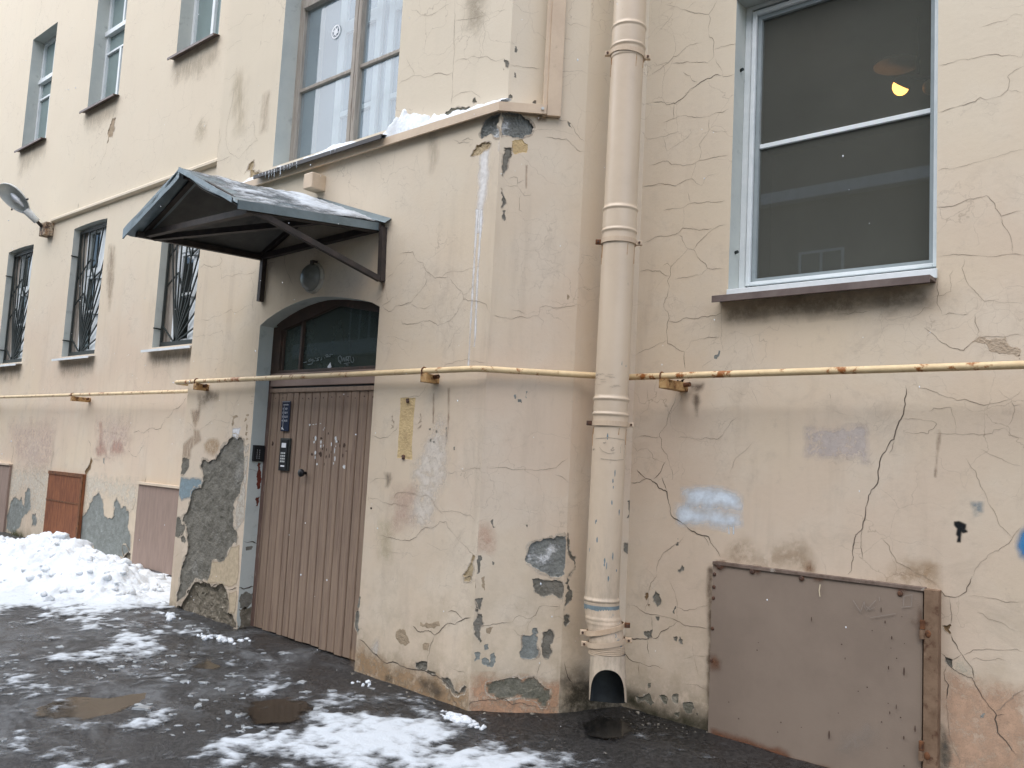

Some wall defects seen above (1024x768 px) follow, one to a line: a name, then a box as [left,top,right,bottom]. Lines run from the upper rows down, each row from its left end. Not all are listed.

water stain [468,149,489,366]
flaking render [470,112,536,221]
crack [639,1,734,367]
crack [850,196,1020,351]
flaking render [80,491,132,559]
flaking render [171,414,262,629]
crack [361,606,558,708]
flaking render [462,555,496,667]
flaking render [484,675,552,709]
flaking render [519,532,576,660]
crack [625,402,719,689]
crack [849,388,1022,763]